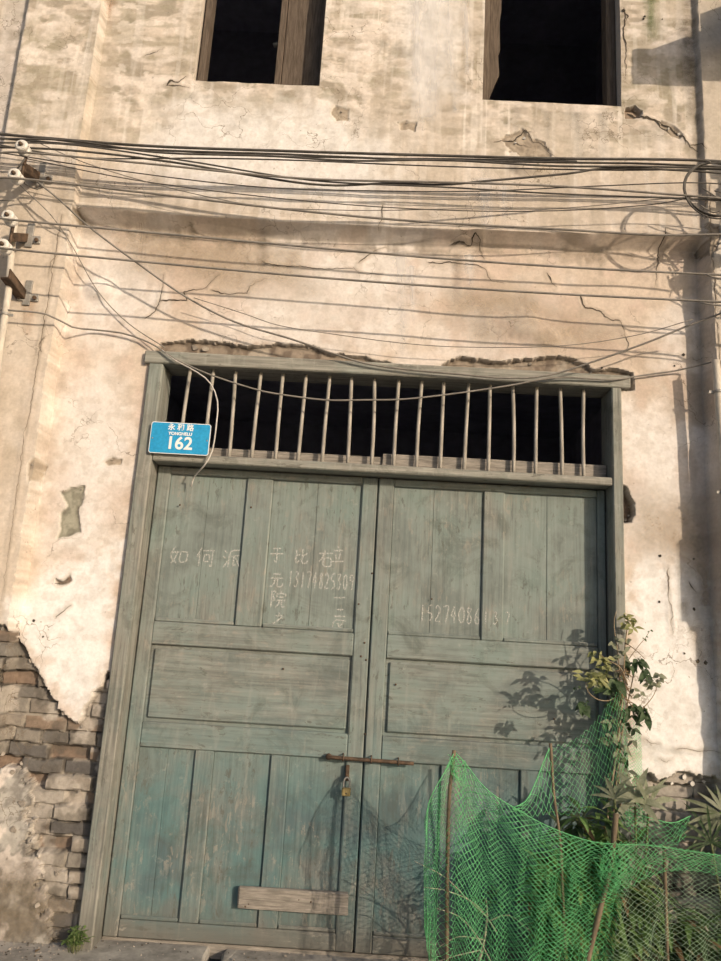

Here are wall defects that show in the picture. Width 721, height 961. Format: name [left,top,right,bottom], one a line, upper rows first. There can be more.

flaking render [499,126,554,157]
crack [146,205,383,318]
crack [429,232,502,283]
crack [627,113,721,368]
flaking render [153,337,394,363]
crack [580,297,629,349]
flaking render [56,484,87,541]
flaking render [623,482,637,524]
flaking render [0,614,110,944]
flaking render [629,768,721,907]